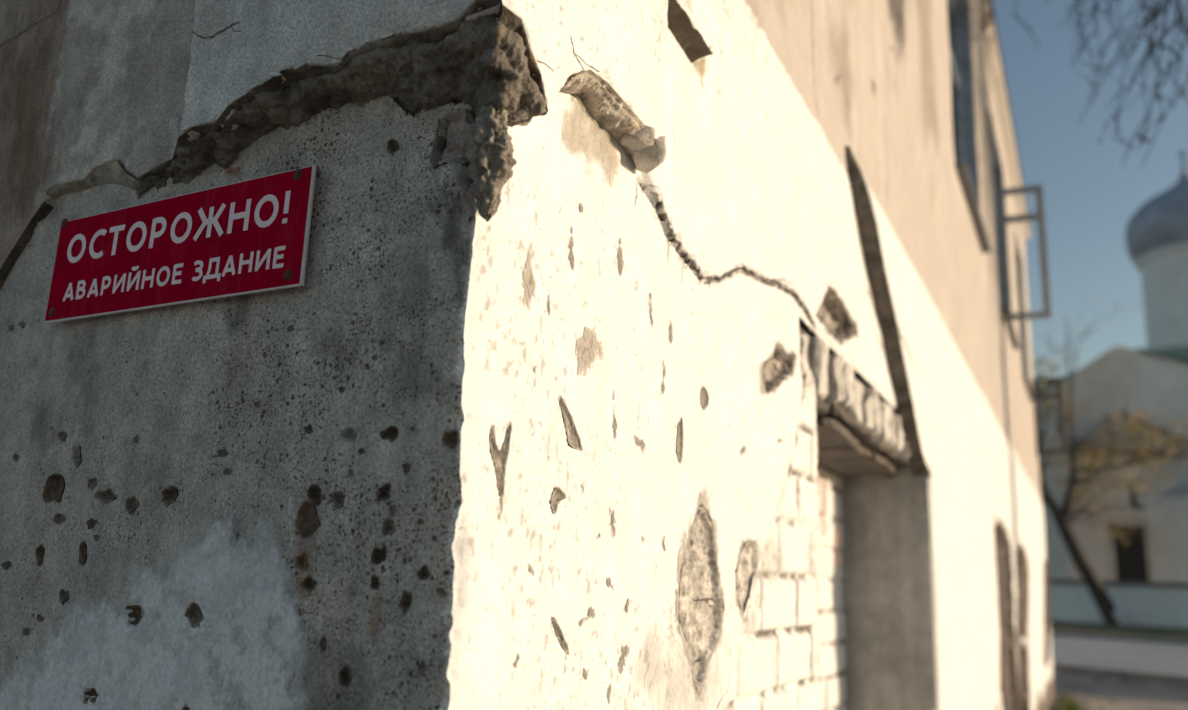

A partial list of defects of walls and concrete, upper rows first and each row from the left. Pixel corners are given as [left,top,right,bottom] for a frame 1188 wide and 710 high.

spalling [0,0,548,289]
spalling [522,252,536,311]
crack [635,180,817,326]
spalling [815,285,858,345]
spalling [844,146,931,478]
spalling [663,341,820,710]